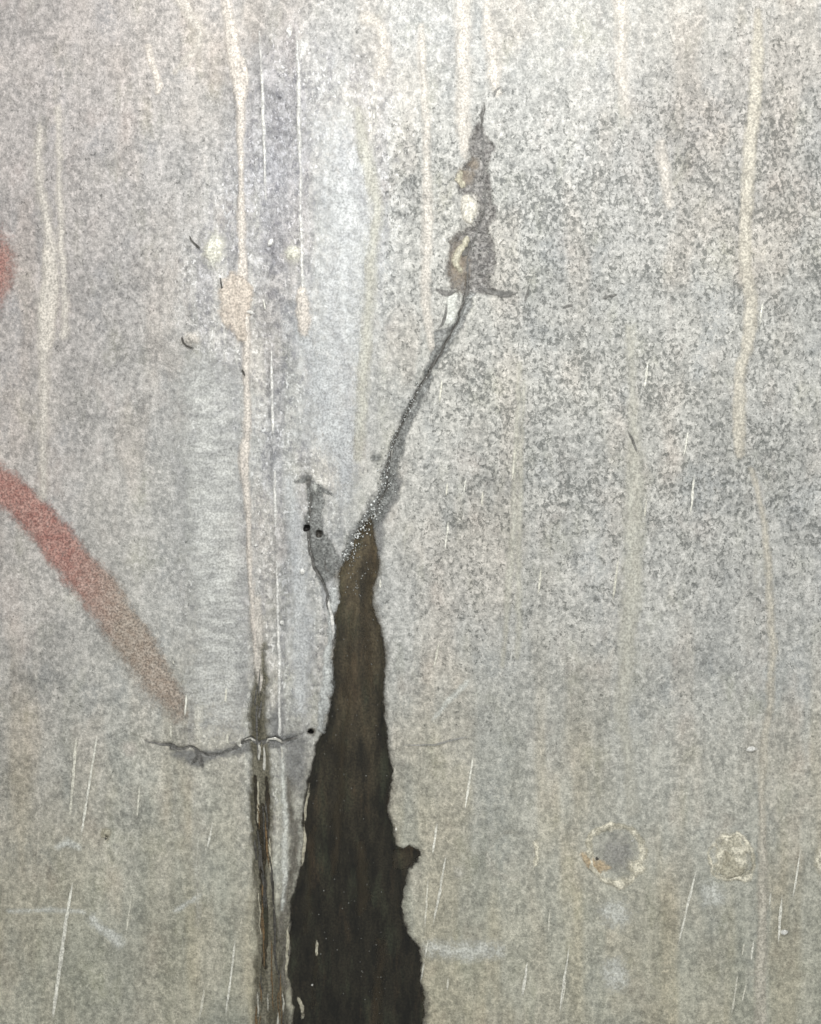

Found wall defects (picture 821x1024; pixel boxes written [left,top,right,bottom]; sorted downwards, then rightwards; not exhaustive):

leakage [219,0,427,1024]
crack [145,87,529,770]